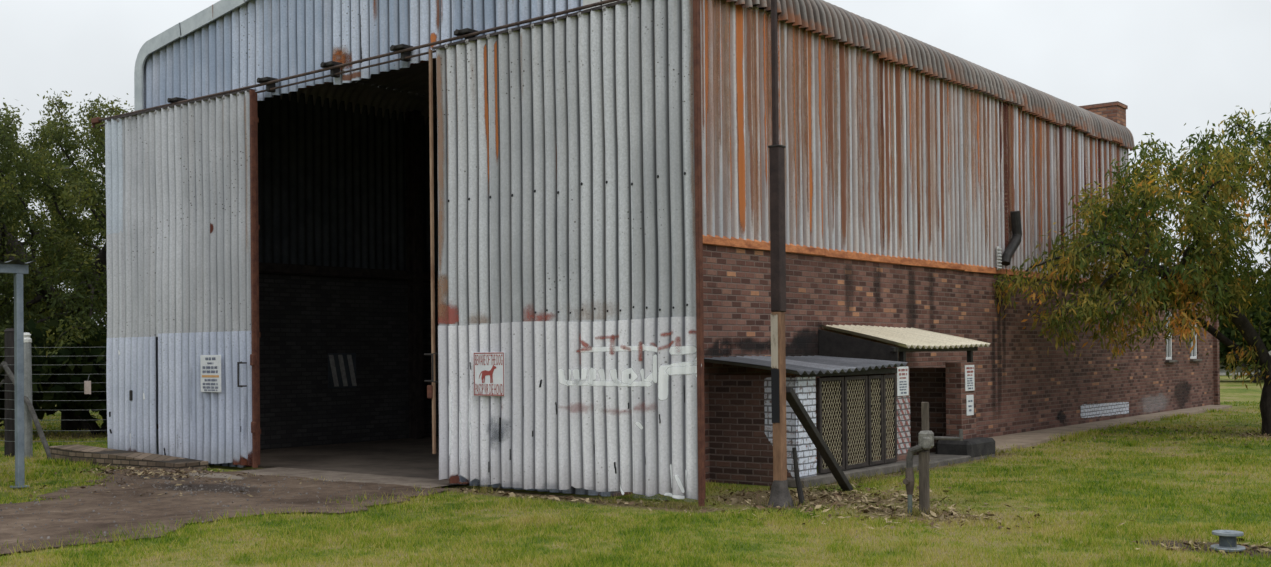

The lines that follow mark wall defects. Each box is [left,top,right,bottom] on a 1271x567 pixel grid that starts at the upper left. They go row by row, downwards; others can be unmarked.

corrosion [430,0,459,324]
corrosion [484,41,498,183]
corrosion [690,0,1120,260]
corrosion [527,310,551,321]